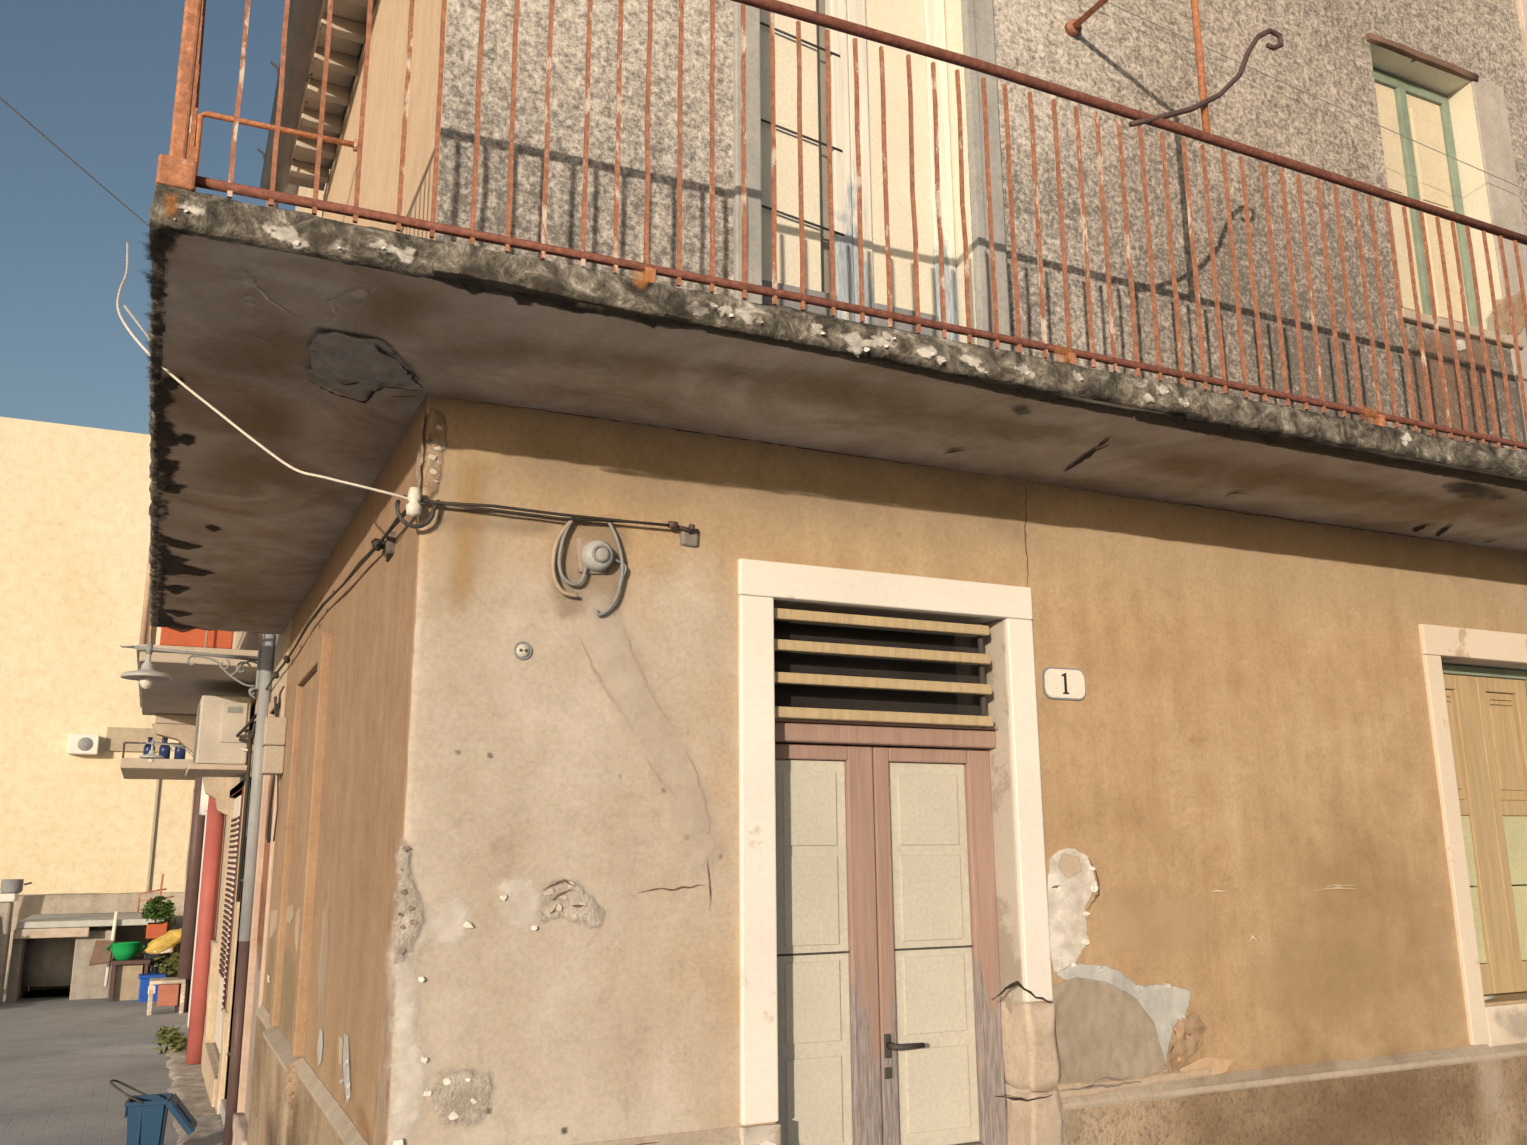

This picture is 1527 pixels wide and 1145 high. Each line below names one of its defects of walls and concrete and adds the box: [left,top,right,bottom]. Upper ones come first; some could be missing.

spalling [305,332,423,404]
leakage [144,225,221,633]
spalling [415,409,447,498]
peeling [257,884,301,982]
spalling [499,879,604,931]
crack [638,860,711,907]
peeling [1047,848,1207,1074]